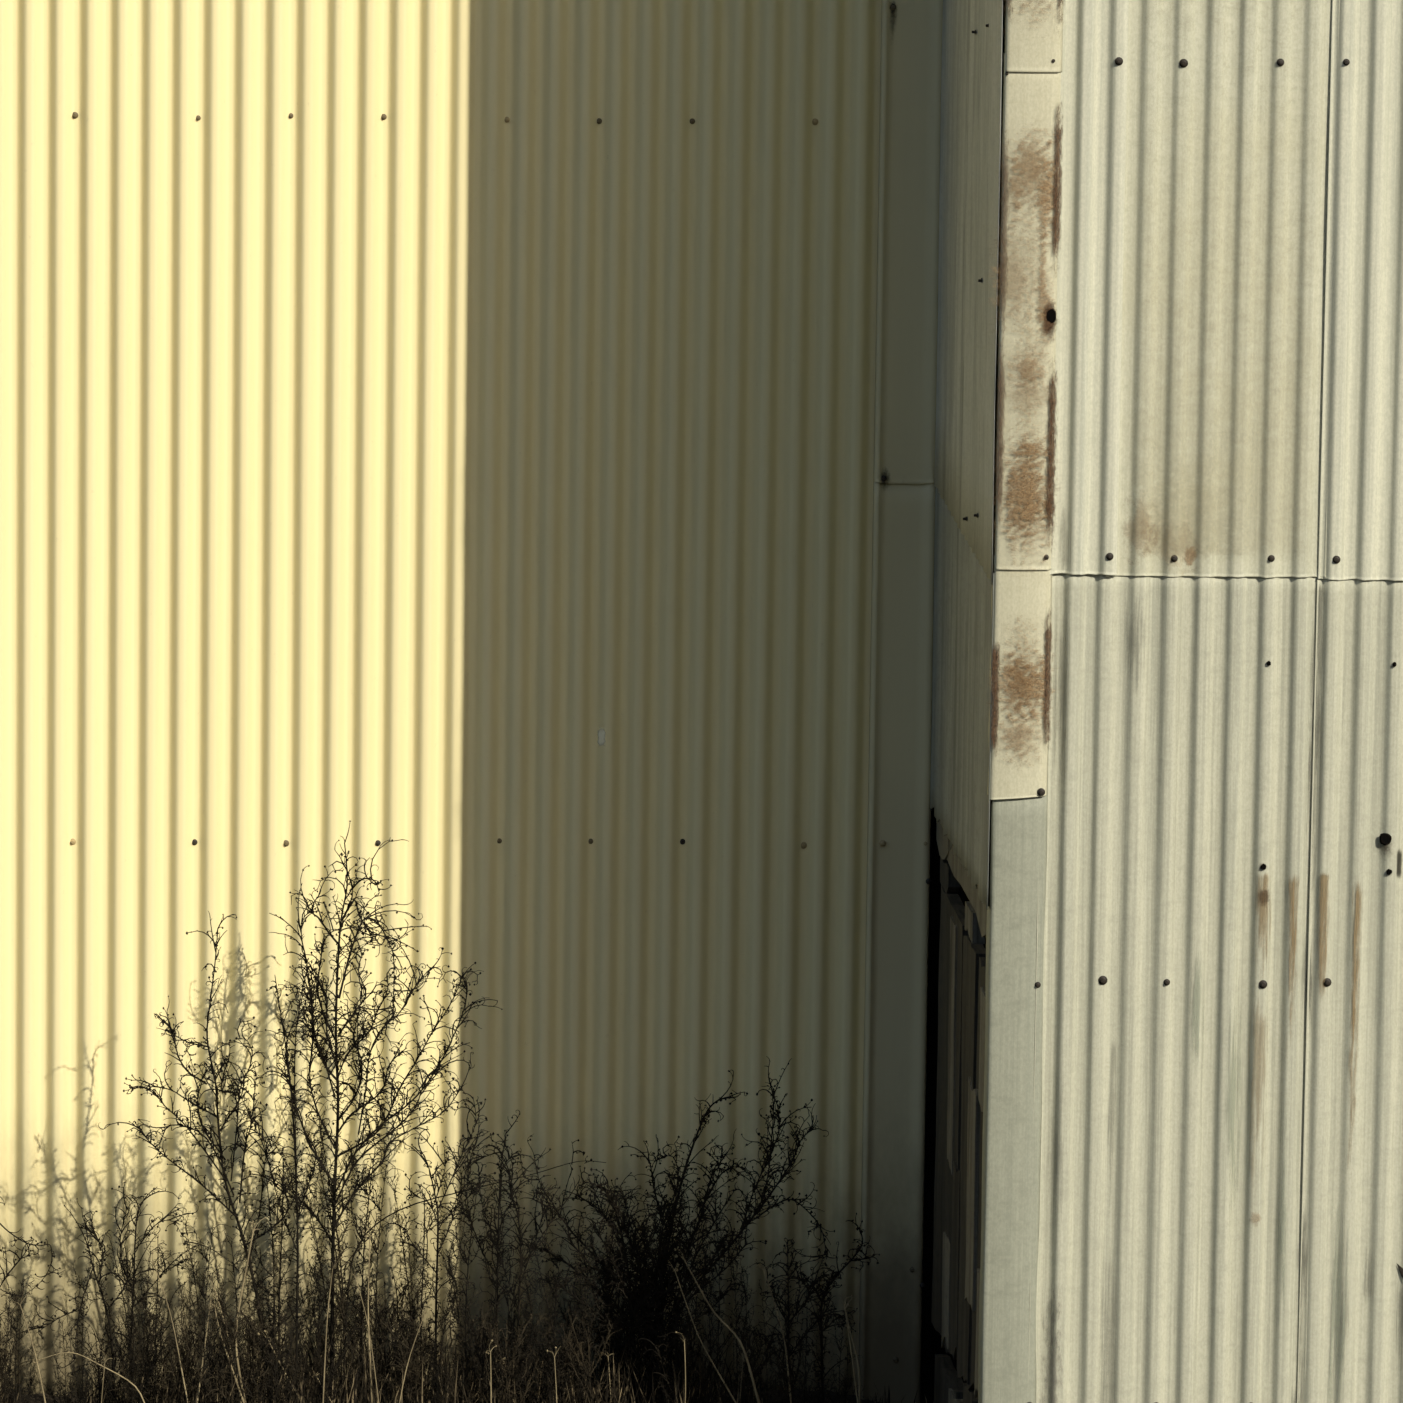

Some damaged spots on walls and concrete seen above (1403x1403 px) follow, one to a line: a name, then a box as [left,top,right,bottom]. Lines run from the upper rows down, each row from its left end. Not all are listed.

corrosion [1001,103,1063,341]
corrosion [997,345,1057,557]
corrosion [991,612,1054,747]
corrosion [1258,875,1268,959]
corrosion [1289,878,1297,992]
corrosion [1319,874,1328,984]
corrosion [1349,884,1361,1080]